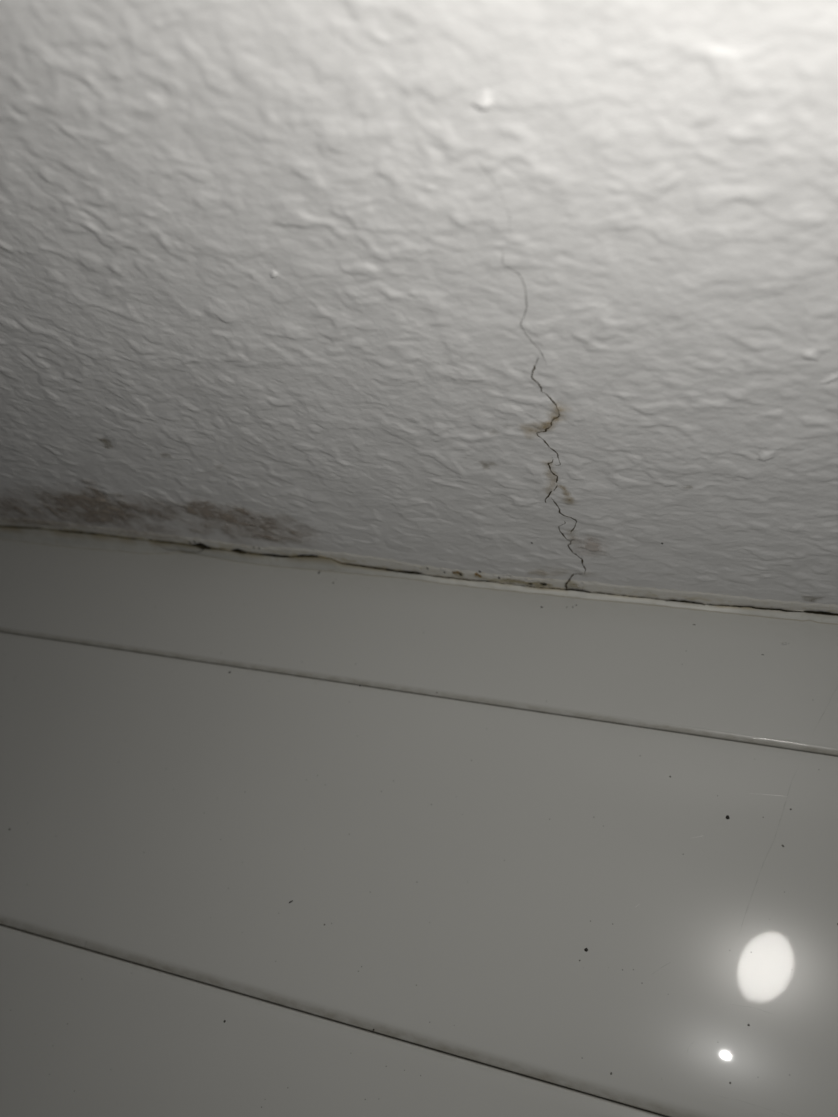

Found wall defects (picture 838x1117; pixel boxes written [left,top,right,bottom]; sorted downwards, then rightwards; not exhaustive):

crack [0,263,838,616]